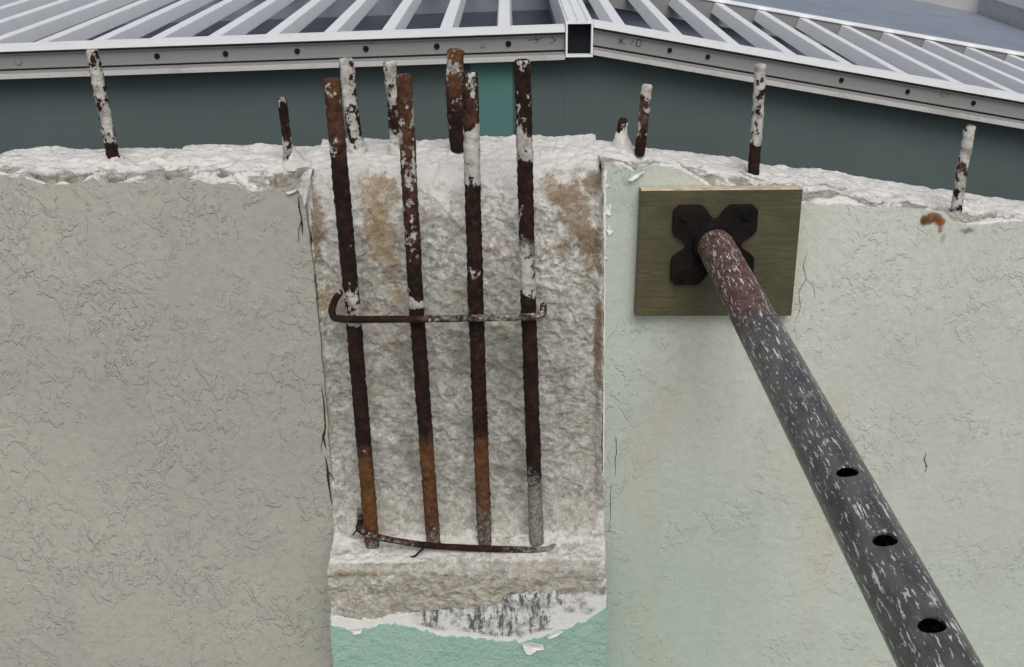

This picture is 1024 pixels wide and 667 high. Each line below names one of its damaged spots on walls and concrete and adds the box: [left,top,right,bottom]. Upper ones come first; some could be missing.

spalling [596,63,1024,225]
corrosion [359,175,400,275]
corrosion [545,169,602,277]
corrosion [921,213,945,232]
spalling [0,48,613,643]
crack [321,385,335,504]
peeling [522,642,544,655]